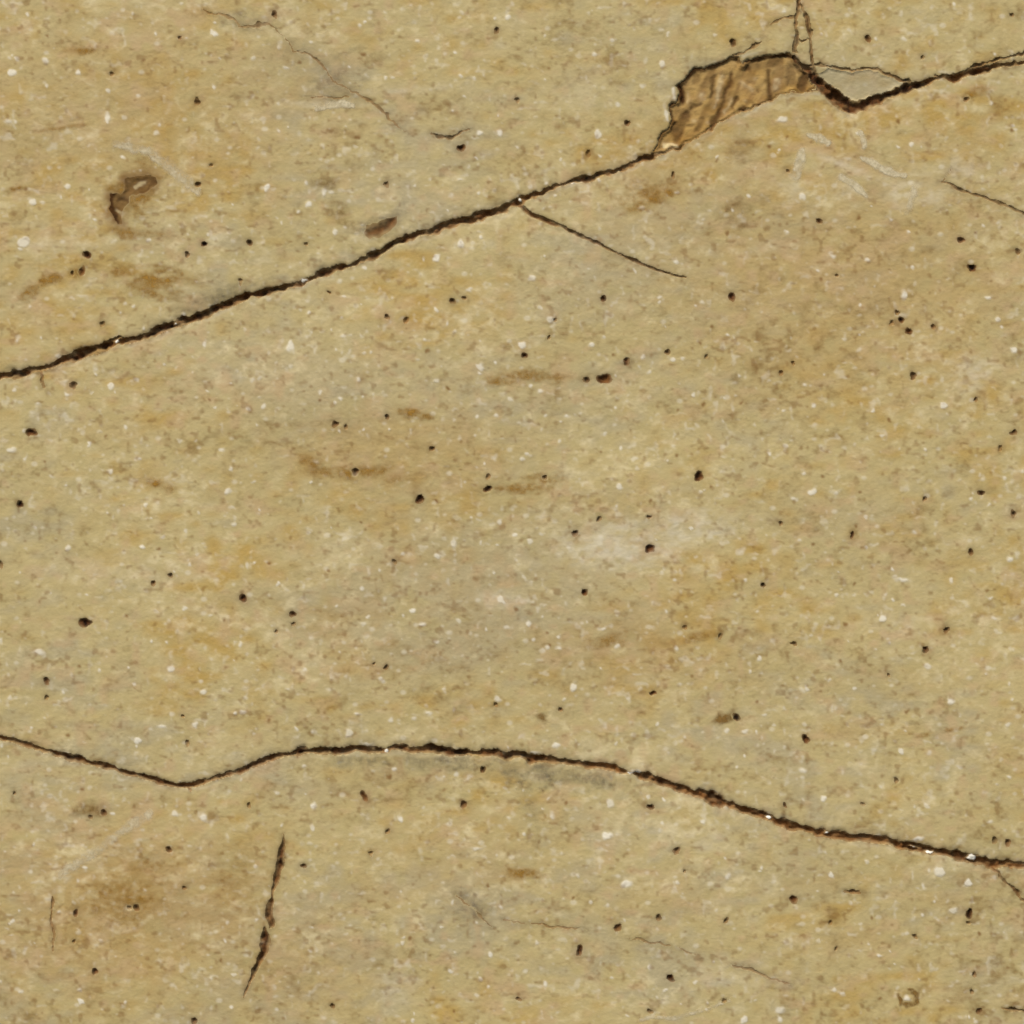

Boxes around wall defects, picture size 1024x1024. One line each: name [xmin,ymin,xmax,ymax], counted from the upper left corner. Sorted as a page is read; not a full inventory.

spalling [653,52,903,153]
crack [0,0,1024,388]
crack [0,735,1024,902]
crack [243,834,286,998]